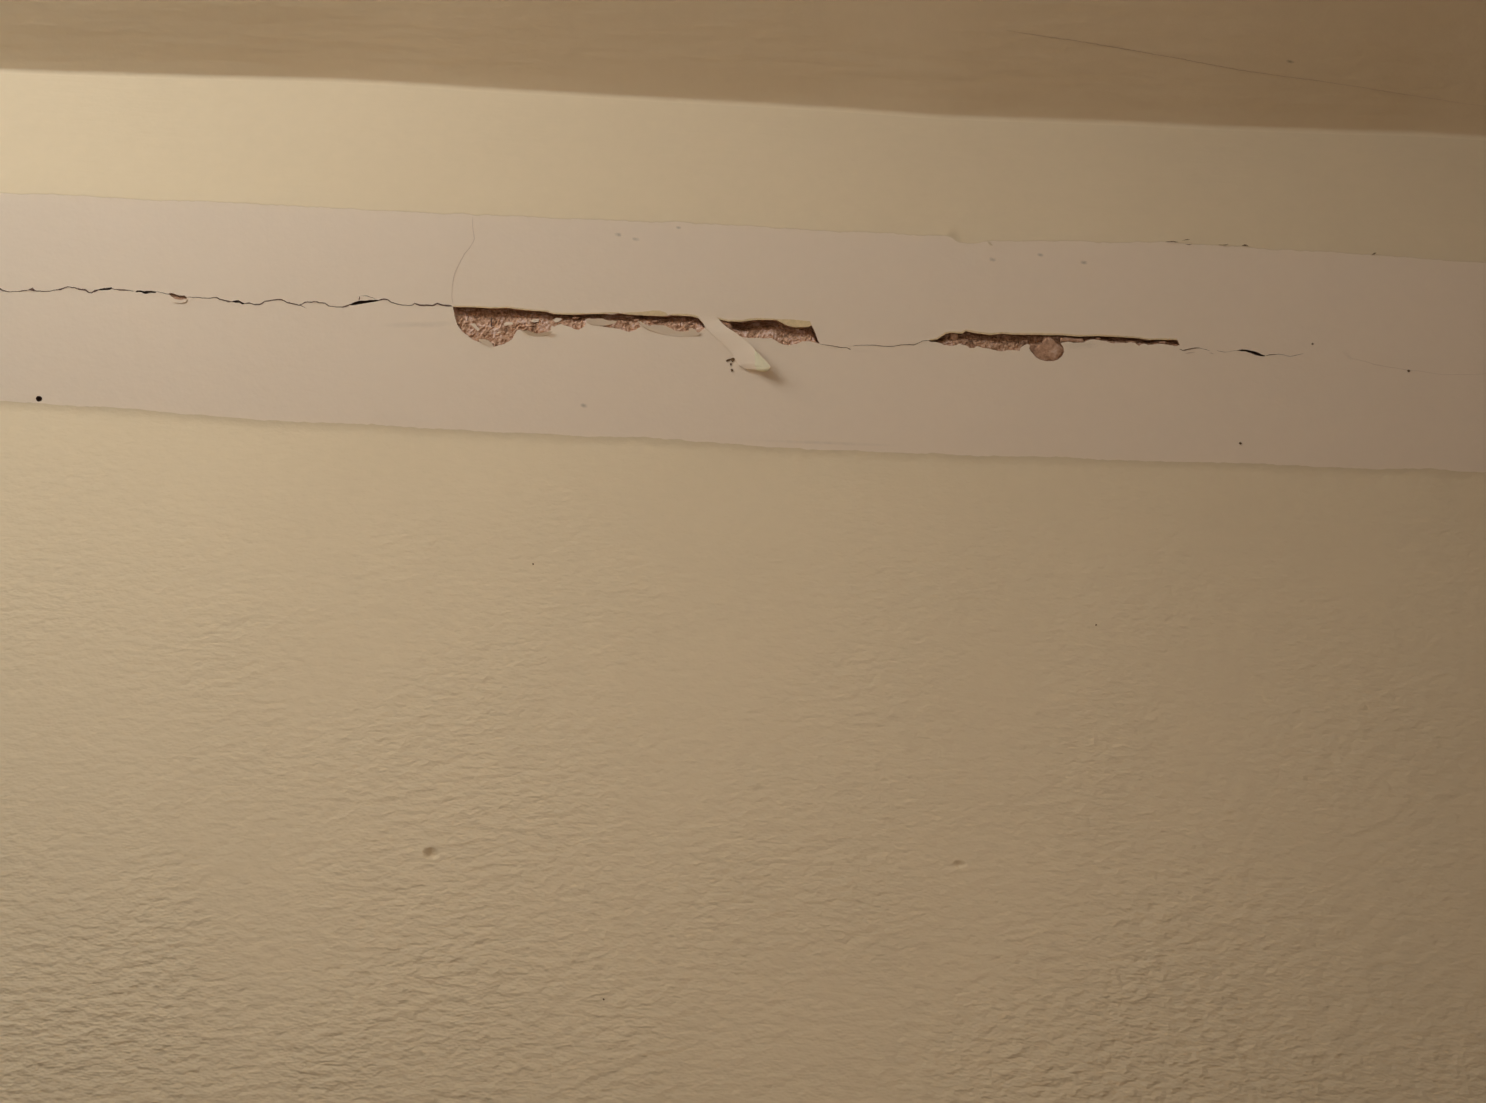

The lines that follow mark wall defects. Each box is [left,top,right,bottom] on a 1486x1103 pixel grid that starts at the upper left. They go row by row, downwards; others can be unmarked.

crack [0,219,475,308]
spalling [453,306,820,372]
crack [822,340,928,350]
spalling [928,330,1180,361]
crack [1180,347,1300,357]